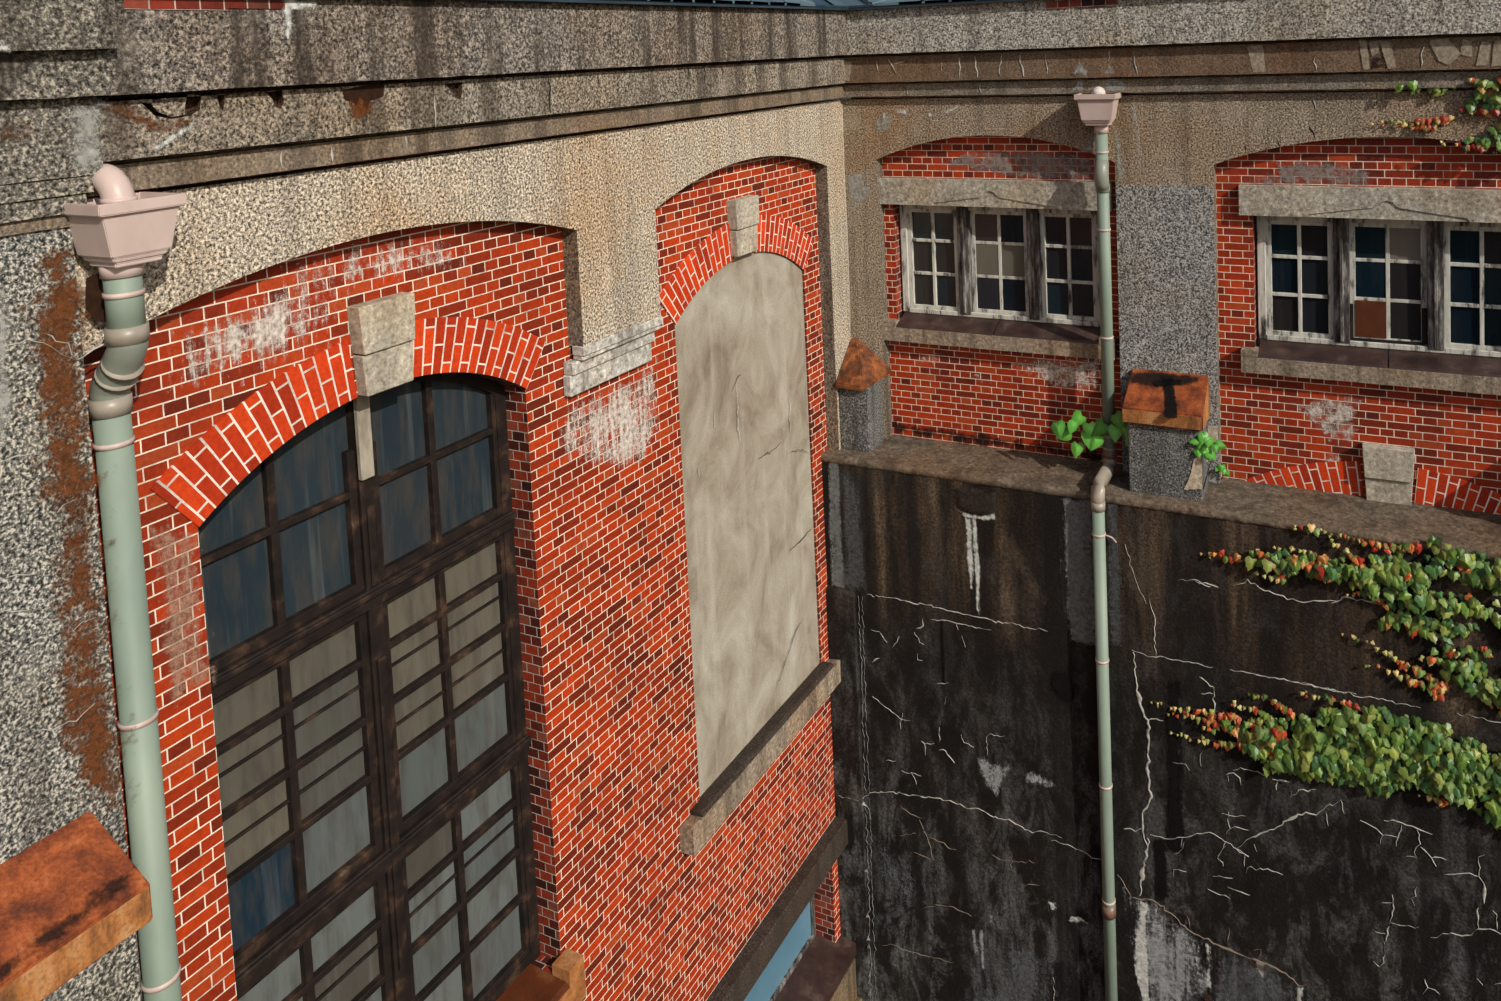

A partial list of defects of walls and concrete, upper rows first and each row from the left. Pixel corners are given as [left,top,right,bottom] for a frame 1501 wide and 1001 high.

efflorescence [564,369,656,464]
corrosion [22,250,132,816]
leakage [828,463,866,596]
efflorescence [963,513,995,611]
leakage [1060,498,1144,645]
efflorescence [979,760,1009,794]
crack [839,545,1501,1001]
leakage [1130,681,1303,1001]
leakage [972,916,1053,1001]